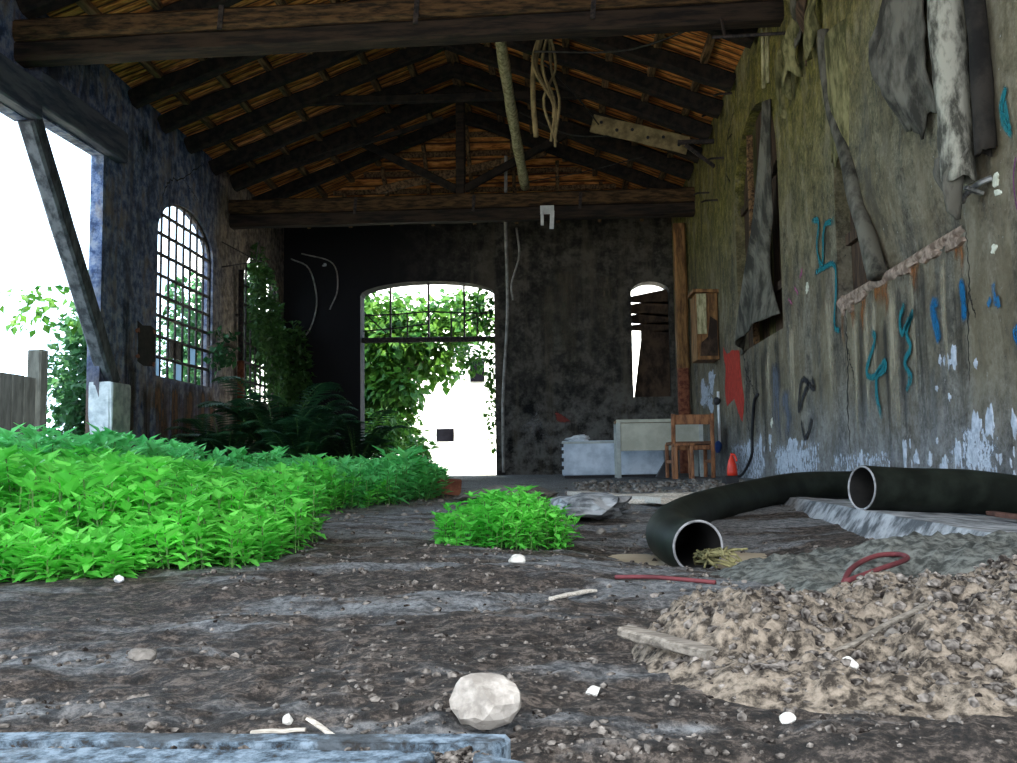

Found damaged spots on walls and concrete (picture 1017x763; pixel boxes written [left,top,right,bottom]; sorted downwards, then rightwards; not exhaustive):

spalling [992,172,1002,196]
peeling [938,344,957,371]
peeling [731,417,820,479]
peeling [831,449,890,471]
peeling [902,403,1017,475]